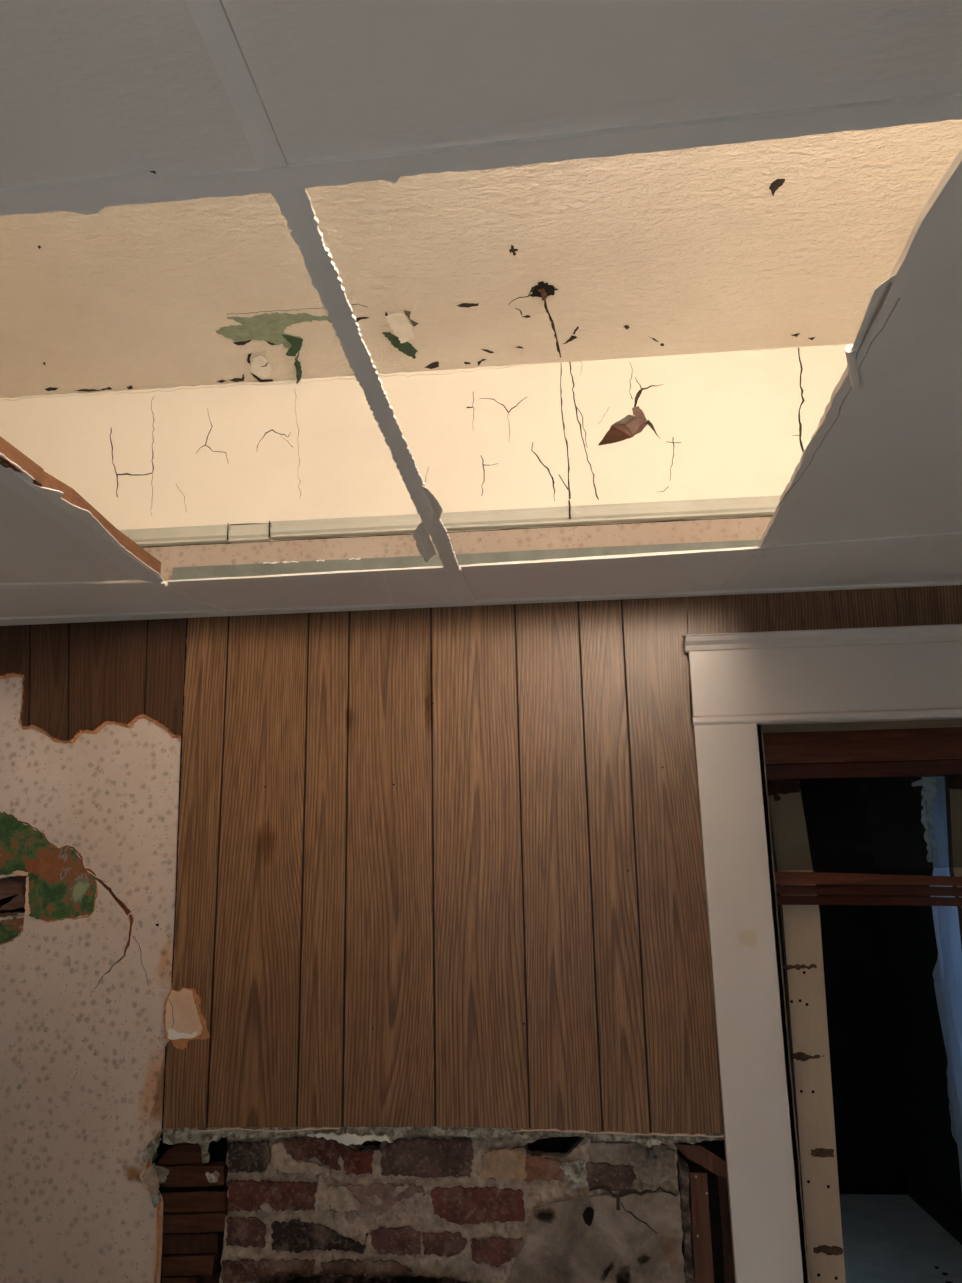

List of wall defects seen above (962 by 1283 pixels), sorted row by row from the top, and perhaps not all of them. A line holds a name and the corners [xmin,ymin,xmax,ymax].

peeling [215,312,332,384]
peeling [382,310,439,369]
crack [110,397,187,515]
crack [196,414,229,464]
crack [257,393,301,496]
crack [467,300,609,500]
spalling [598,364,663,446]
crack [661,437,681,492]
crack [793,348,805,452]
spalling [0,811,98,945]
crack [94,876,148,989]
crack [621,1202,658,1234]